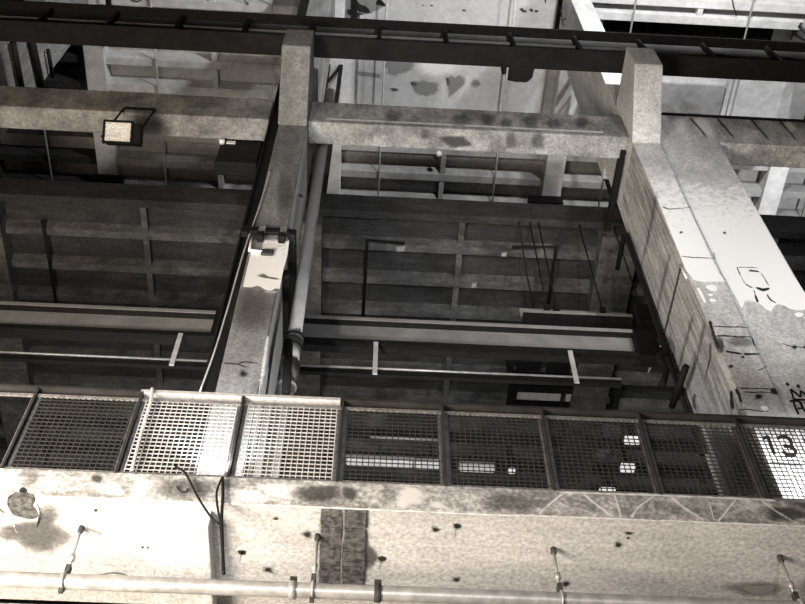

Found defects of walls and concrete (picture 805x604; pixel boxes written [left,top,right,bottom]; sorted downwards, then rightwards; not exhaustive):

water stain [327,118,603,133]
water stain [443,137,470,147]
peeling [647,173,805,317]